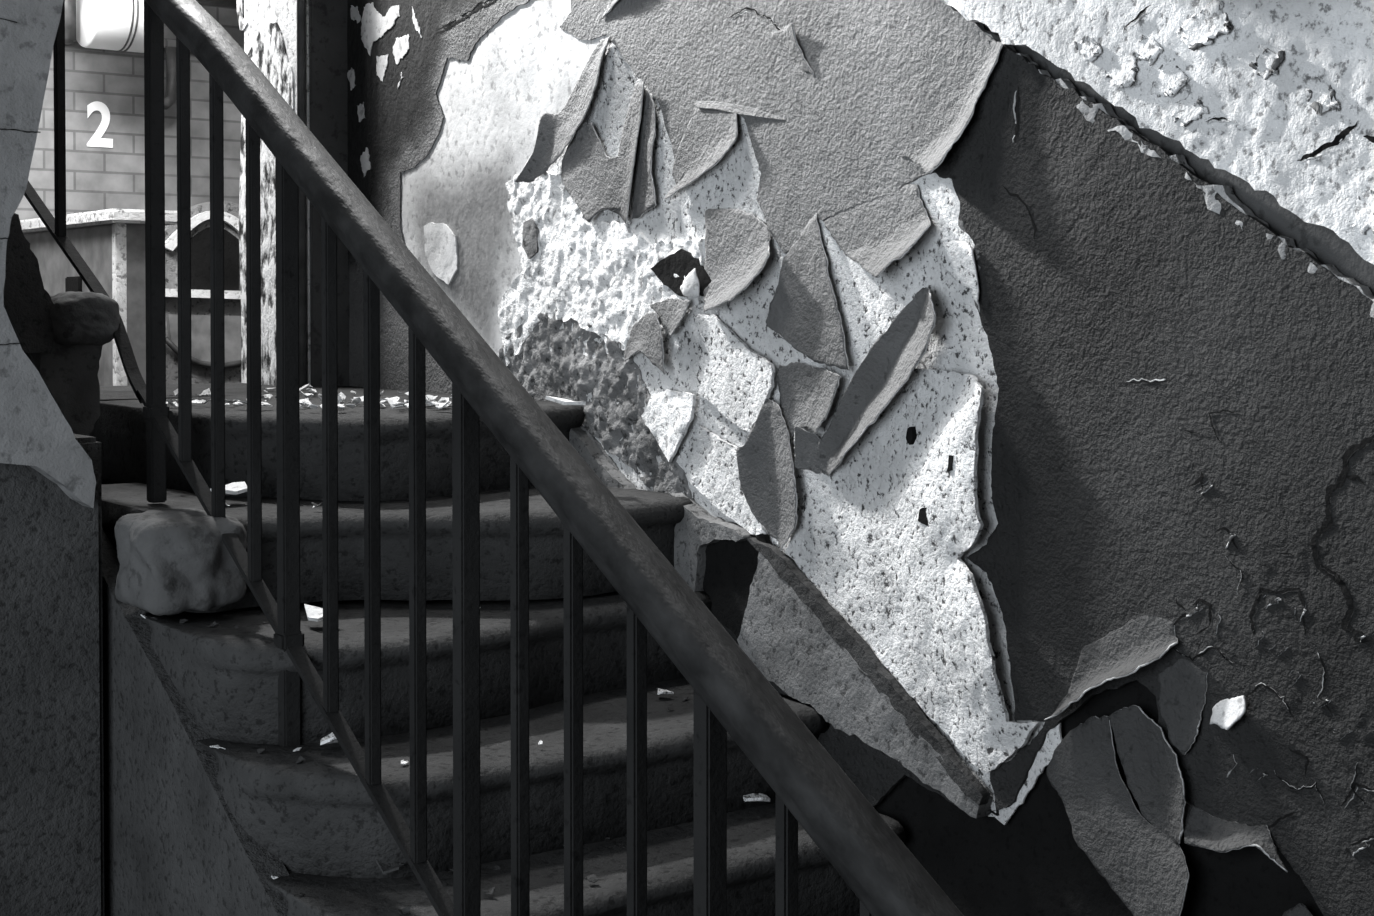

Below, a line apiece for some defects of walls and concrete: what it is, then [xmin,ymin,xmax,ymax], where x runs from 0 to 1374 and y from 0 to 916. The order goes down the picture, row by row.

peeling [350,2,422,88]
peeling [347,68,365,122]
peeling [360,147,371,177]
spalling [401,0,1374,916]
crack [1184,409,1239,442]
crack [1172,435,1374,846]